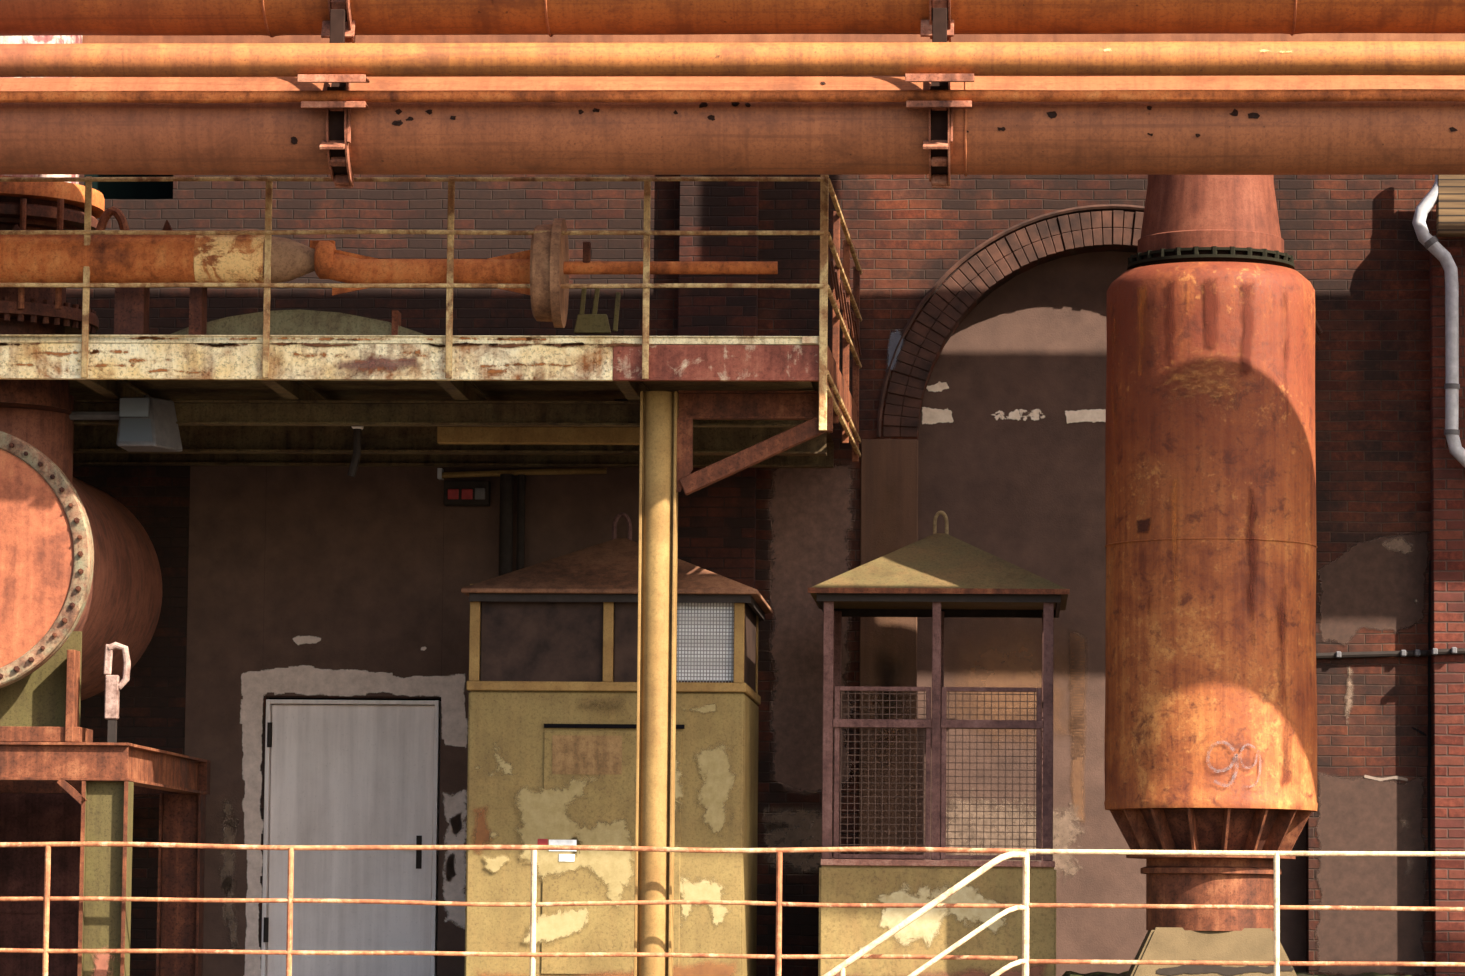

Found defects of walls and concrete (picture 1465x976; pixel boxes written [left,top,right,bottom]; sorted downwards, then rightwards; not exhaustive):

corrosion [0,336,205,374]
corrosion [197,337,655,374]
corrosion [1204,279,1220,348]
corrosion [1242,284,1254,373]
peeling [922,381,954,425]
peeling [991,409,1045,421]
peeling [1065,409,1106,424]
corrosion [1248,498,1258,611]
corrosion [1282,721,1290,784]
peeling [442,742,635,929]
peeling [523,907,589,944]
peeling [877,879,1007,947]